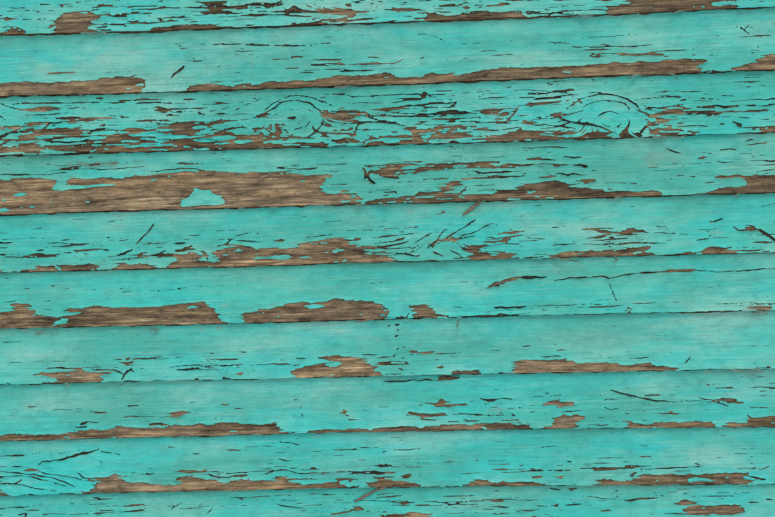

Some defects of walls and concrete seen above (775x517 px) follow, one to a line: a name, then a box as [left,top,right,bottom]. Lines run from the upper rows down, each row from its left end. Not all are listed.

peeling [0,71,146,96]
peeling [186,51,707,91]
peeling [0,98,615,155]
peeling [0,157,662,216]
peeling [112,237,398,269]
peeling [0,301,228,328]
peeling [240,298,391,323]
peeling [290,355,388,378]
peeling [502,356,679,373]
peeling [0,411,288,441]
peeling [623,411,775,428]
peeling [81,469,354,493]